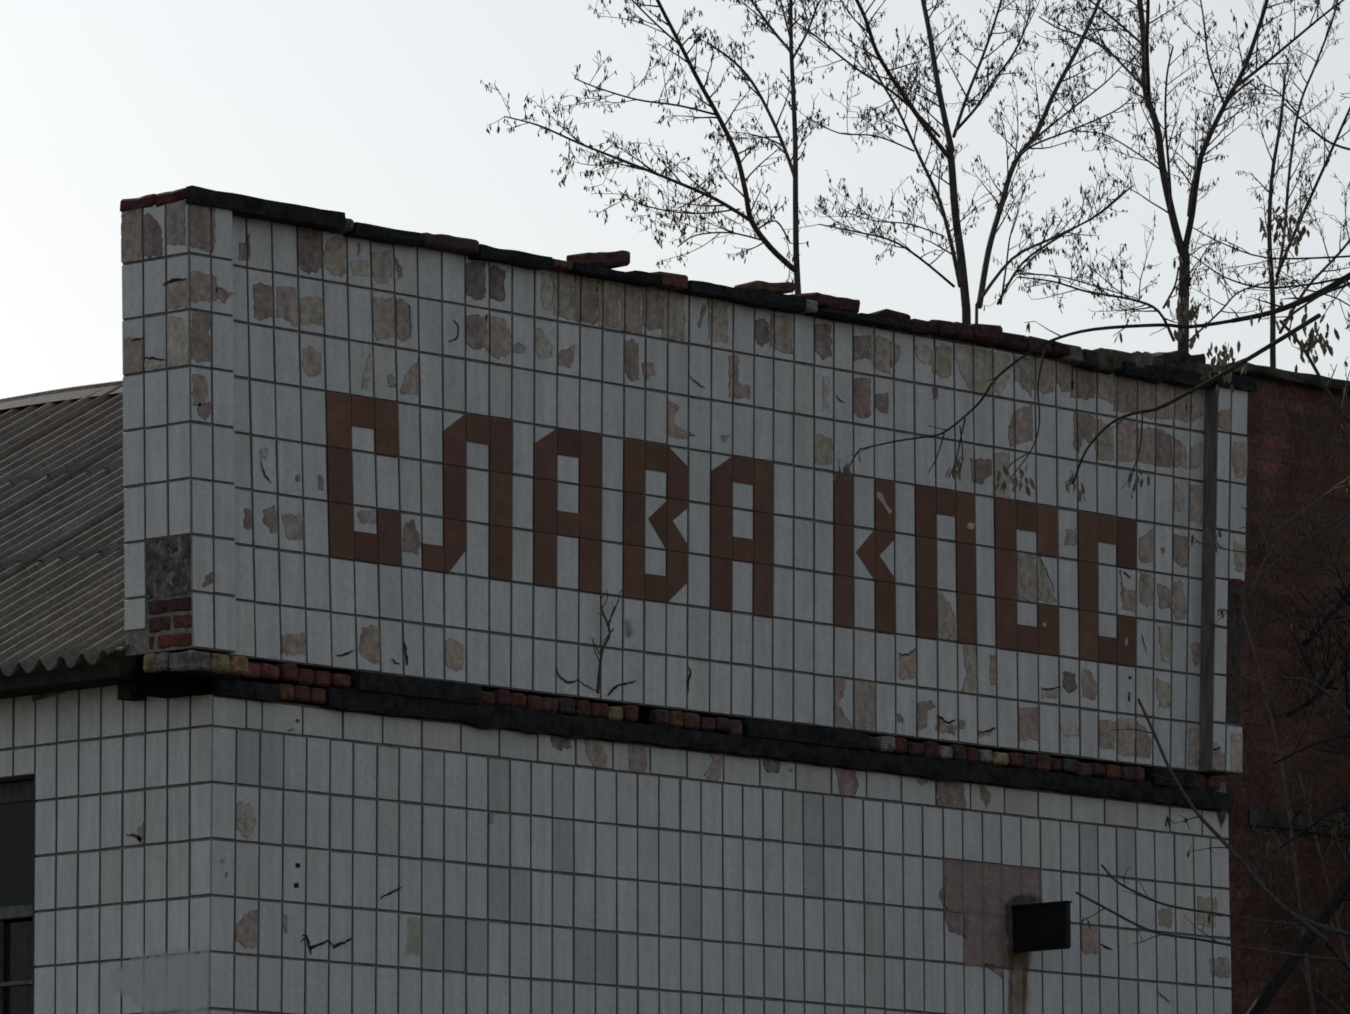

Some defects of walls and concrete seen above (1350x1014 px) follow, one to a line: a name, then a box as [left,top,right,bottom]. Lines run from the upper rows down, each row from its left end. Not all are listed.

peeling [121,200,216,263]
peeling [123,270,234,421]
peeling [253,282,324,327]
peeling [466,261,576,368]
peeling [540,271,751,399]
peeling [853,335,901,419]
peeling [954,346,1248,620]
peeling [146,535,214,649]
crack [556,667,636,696]
crack [301,934,353,954]
peeling [939,859,1041,978]
rust [1004,945,1030,1014]